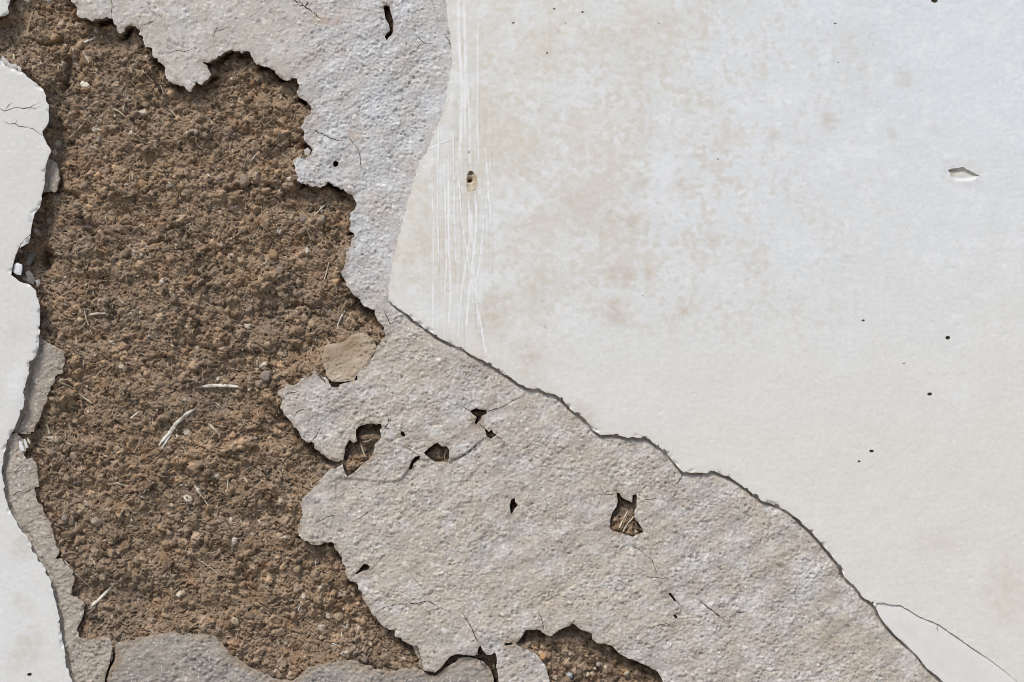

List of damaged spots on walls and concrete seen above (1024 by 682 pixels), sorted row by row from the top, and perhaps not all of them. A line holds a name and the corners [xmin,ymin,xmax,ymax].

spalling [948,167,979,182]
spalling [0,0,421,682]
spalling [470,408,487,424]
spalling [424,443,449,462]
spalling [610,493,643,536]
peeling [107,631,494,682]
spalling [516,624,663,682]